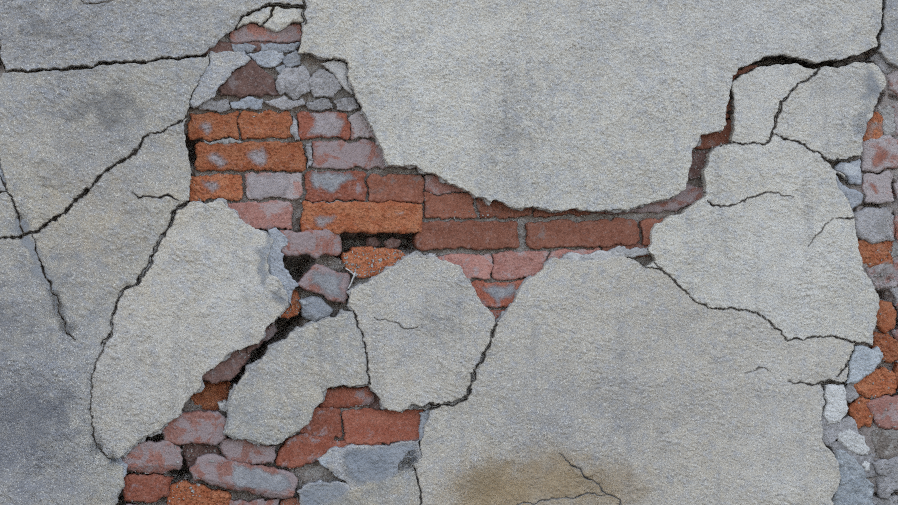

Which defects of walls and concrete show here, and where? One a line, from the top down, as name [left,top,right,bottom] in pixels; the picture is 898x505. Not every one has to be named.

crack [0,45,204,73]
flaking render [189,51,251,109]
crack [235,0,307,29]
crack [720,7,886,187]
crack [0,119,184,340]
flaking render [258,228,299,306]
flaking render [559,246,649,262]
flaking render [834,159,863,209]
crack [90,192,188,462]
crack [625,254,856,386]
flaking render [296,408,430,505]
flaking render [821,345,898,505]